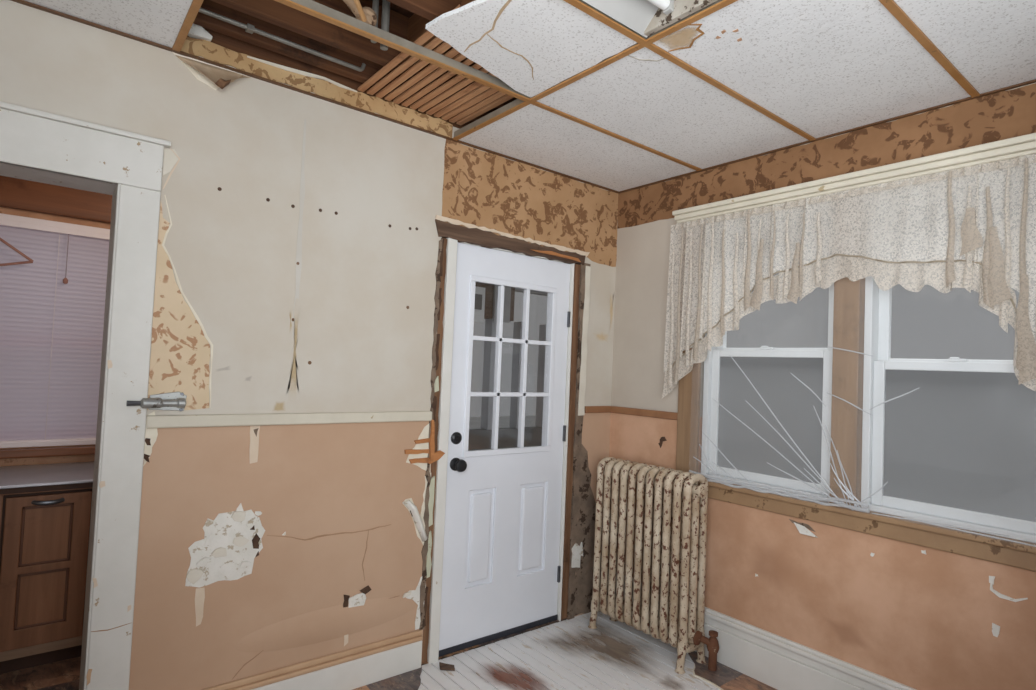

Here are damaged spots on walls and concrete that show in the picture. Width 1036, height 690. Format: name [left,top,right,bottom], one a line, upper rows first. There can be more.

leakage [628,24,742,61]
peeling [172,52,251,90]
flaking render [402,238,445,630]
flaking render [185,503,265,626]
spalling [343,585,372,608]
peeling [989,576,1028,602]